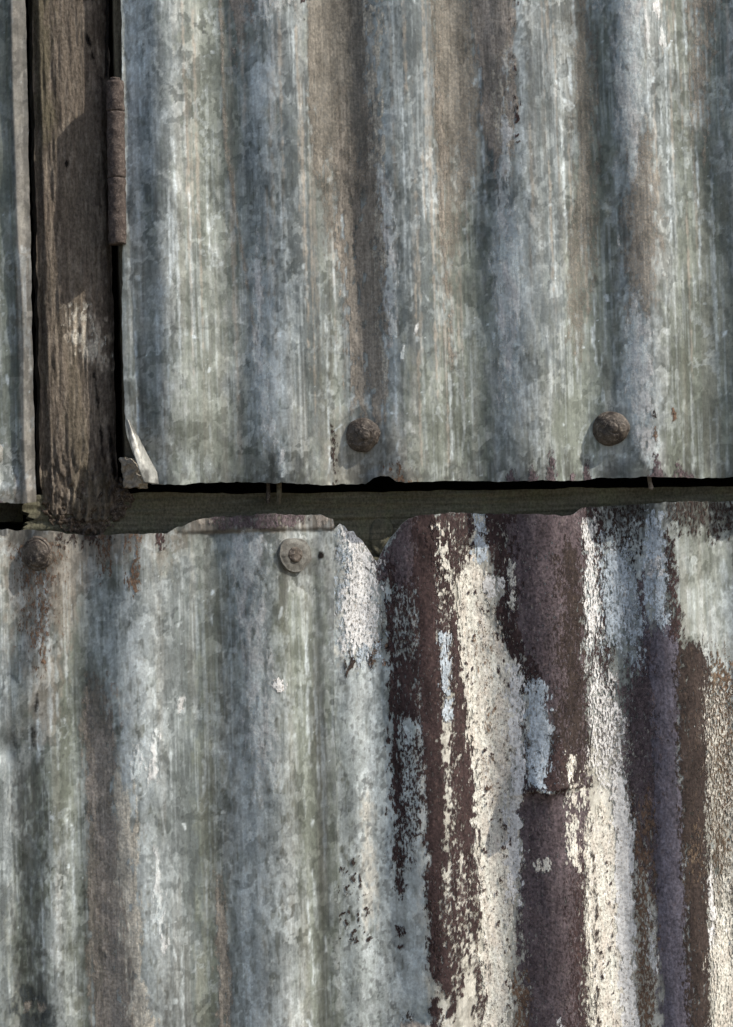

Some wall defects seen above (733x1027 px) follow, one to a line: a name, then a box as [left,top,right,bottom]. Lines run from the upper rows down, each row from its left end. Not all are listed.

rust [4,532,142,678]
peeling [431,514,559,1027]
rust [338,501,733,1027]
peeling [563,509,673,1027]
peeling [701,676,733,1027]